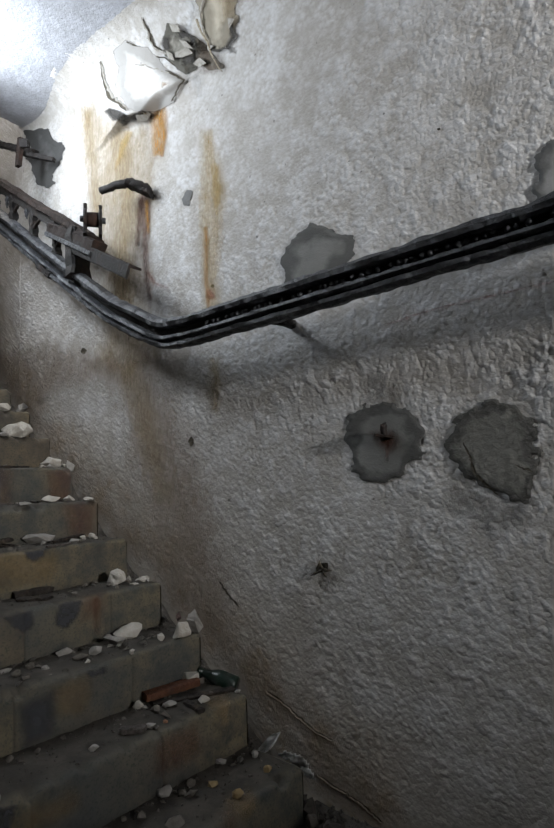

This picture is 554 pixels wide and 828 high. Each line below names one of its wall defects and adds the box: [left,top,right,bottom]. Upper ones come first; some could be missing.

spalling [161,0,239,74]
spalling [105,108,153,125]